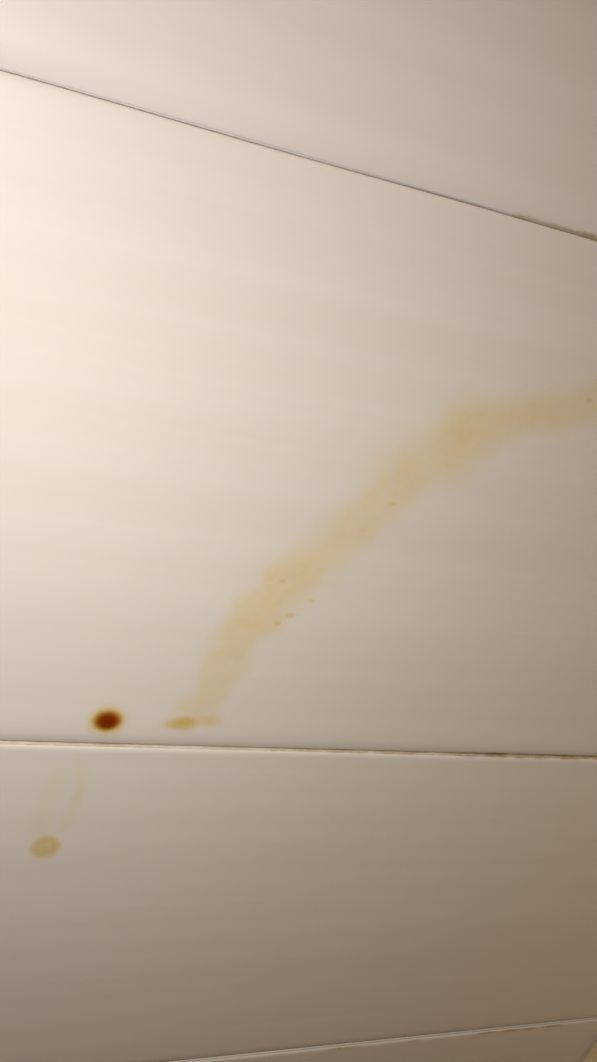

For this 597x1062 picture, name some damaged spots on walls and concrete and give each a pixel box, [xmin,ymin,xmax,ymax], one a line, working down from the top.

rust [99,715,116,727]